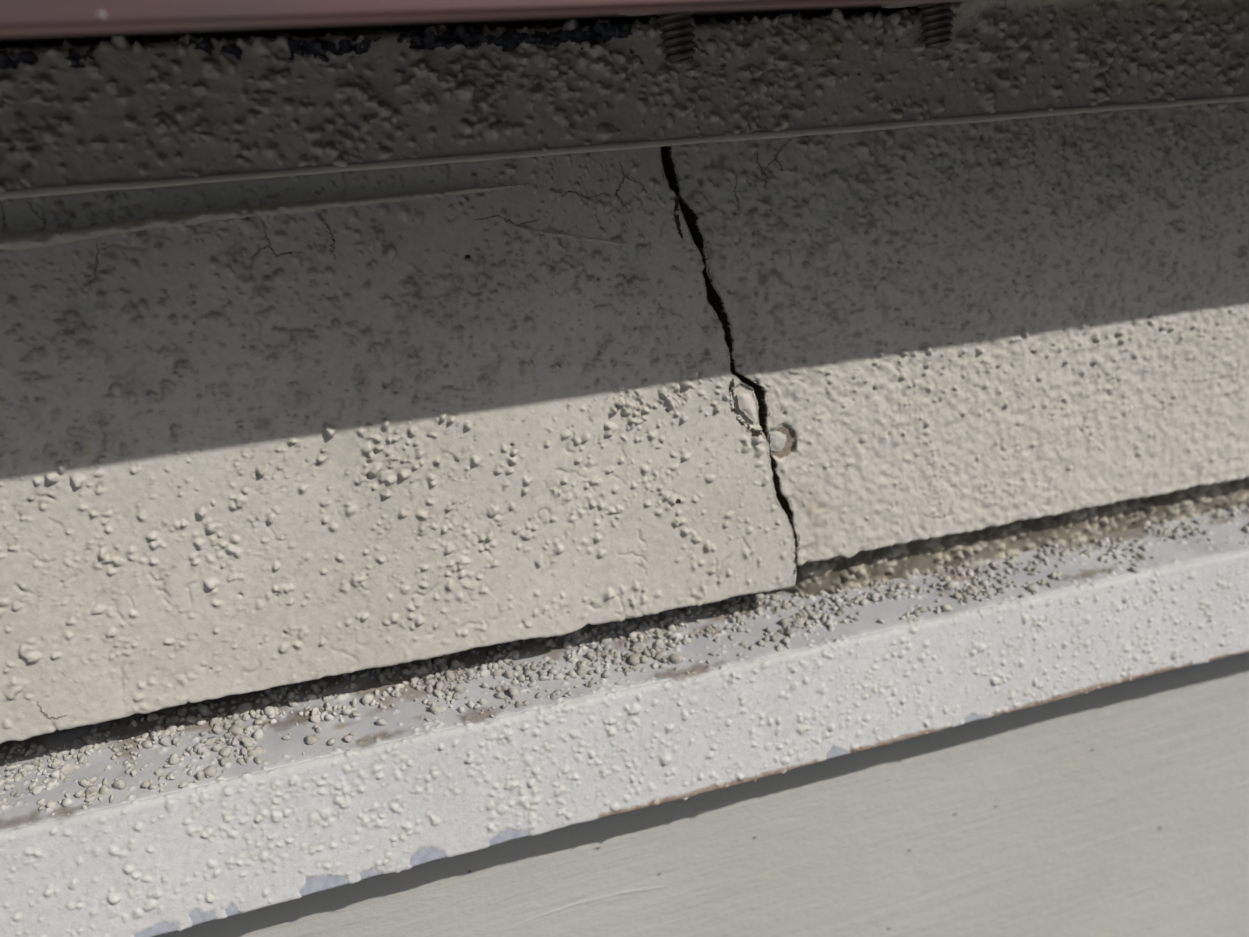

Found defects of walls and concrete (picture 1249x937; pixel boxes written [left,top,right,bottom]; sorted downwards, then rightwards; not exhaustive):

crack [473,138,800,575]